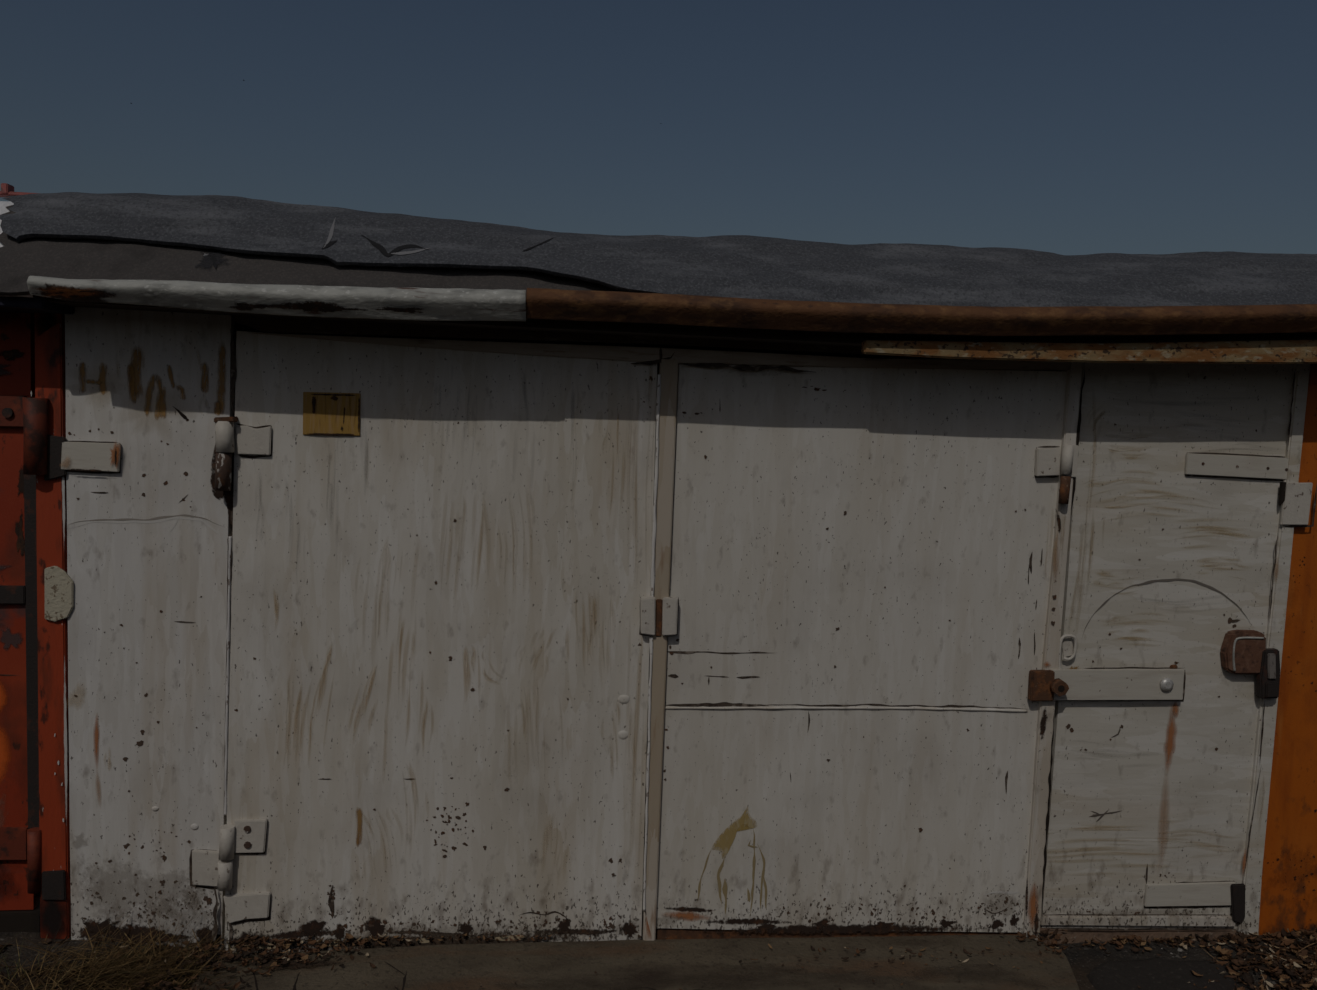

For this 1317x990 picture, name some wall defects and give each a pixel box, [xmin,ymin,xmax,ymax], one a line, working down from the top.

corrosion [1166,705,1178,762]
corrosion [233,897,650,951]
corrosion [666,880,1039,936]